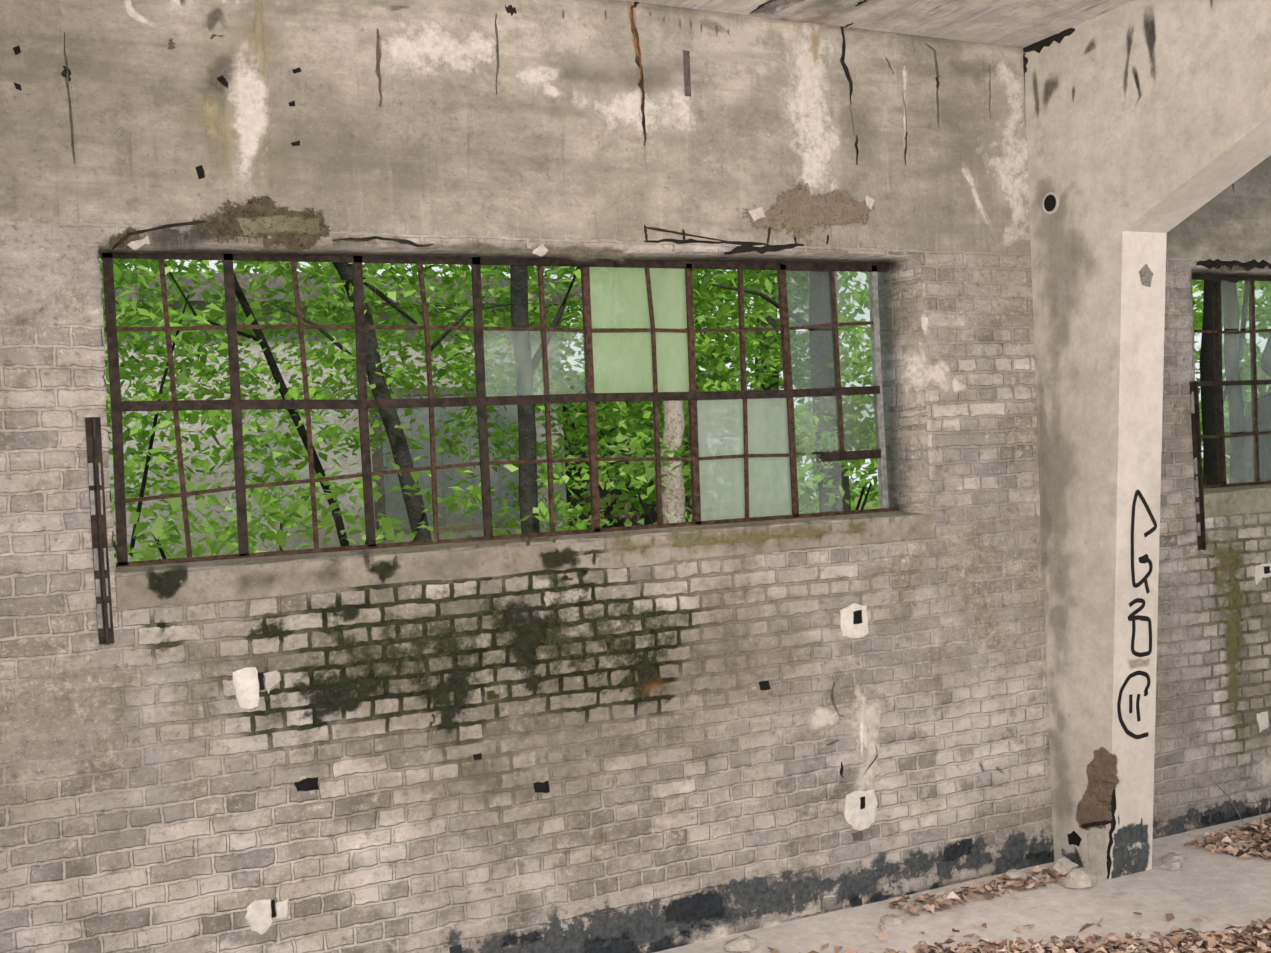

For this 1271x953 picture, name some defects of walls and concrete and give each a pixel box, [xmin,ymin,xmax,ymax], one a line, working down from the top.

peeling [124,0,155,27]
spalling [208,0,239,29]
spalling [211,58,232,89]
leakage [204,8,268,181]
crack [630,2,646,146]
leakage [781,24,840,195]
spalling [108,196,434,254]
spalling [515,244,623,261]
flaking render [644,181,875,255]
leakage [1224,564,1245,754]
peeling [445,747,1271,953]
peeling [275,898,289,919]